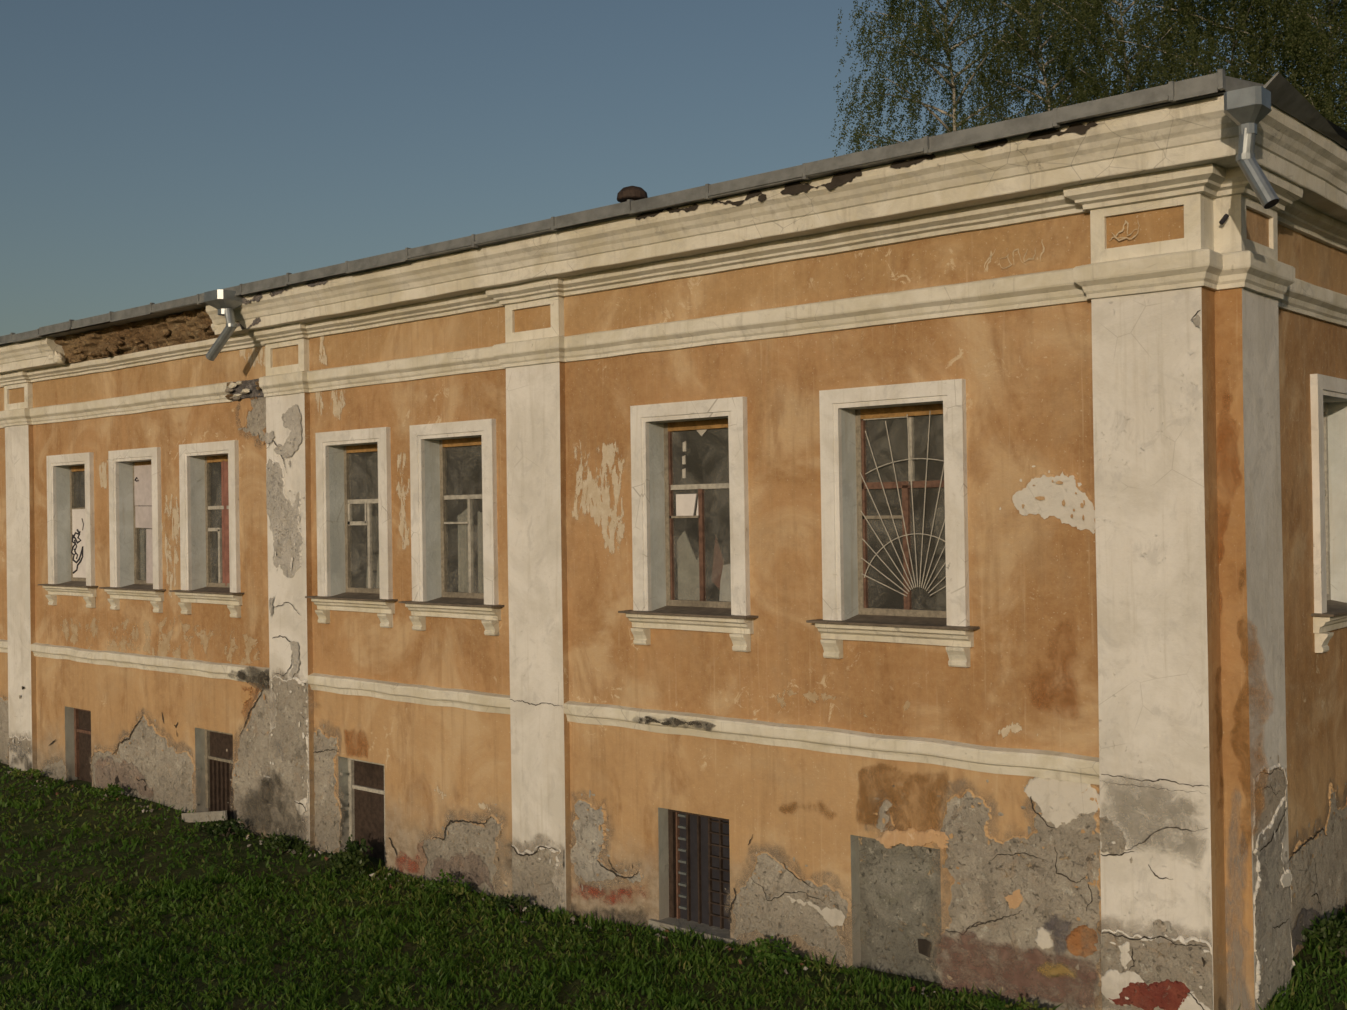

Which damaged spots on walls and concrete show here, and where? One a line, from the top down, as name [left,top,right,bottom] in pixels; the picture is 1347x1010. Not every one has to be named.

peeling [635,204,698,220]
peeling [758,169,862,202]
peeling [890,154,936,169]
peeling [238,397,305,578]
peeling [572,439,625,554]
peeling [999,465,1095,534]
spalling [0,686,32,765]
spalling [60,615,342,853]
spalling [421,790,644,912]
spalling [725,834,852,966]
spalling [874,777,1213,1010]
spalling [1252,744,1347,1007]